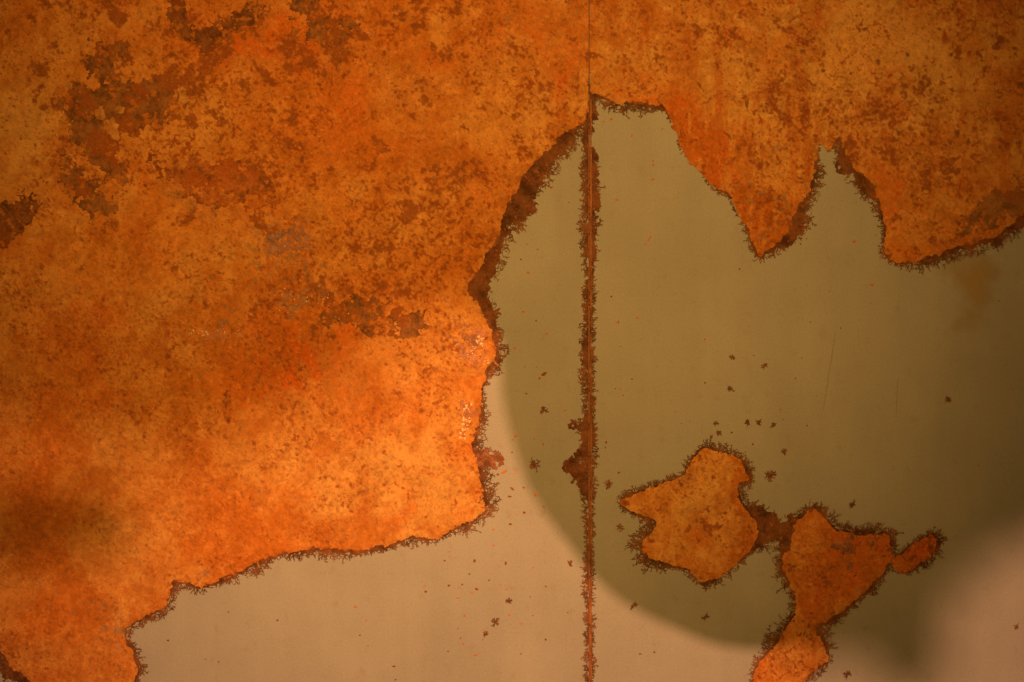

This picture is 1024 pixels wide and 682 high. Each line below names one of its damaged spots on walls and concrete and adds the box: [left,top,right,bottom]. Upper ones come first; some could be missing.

rust [0,0,606,682]
peeling [307,279,432,343]
rust [587,0,1024,273]
peeling [955,176,1024,238]
rust [616,421,947,682]